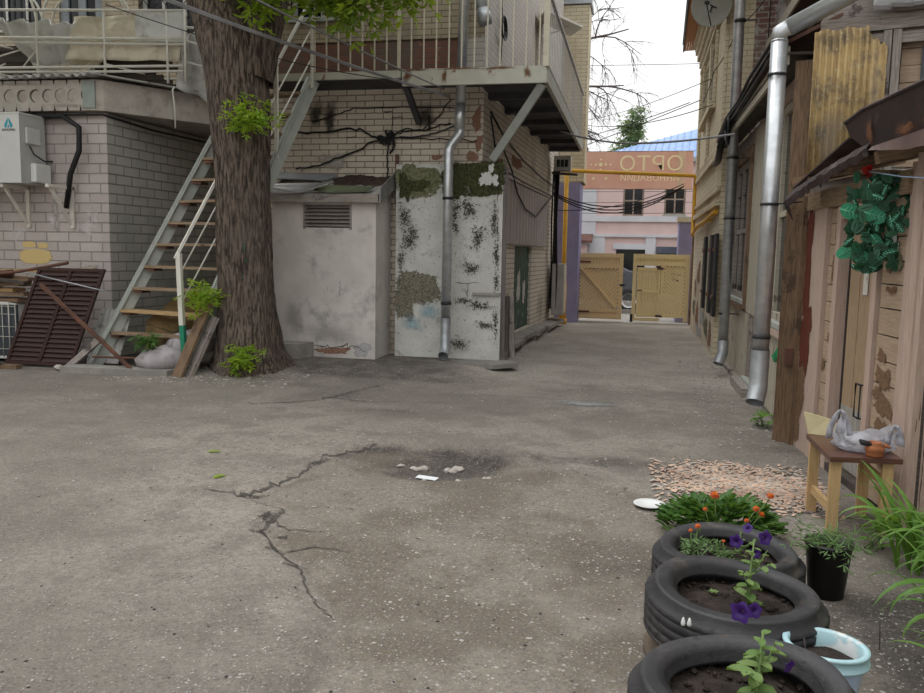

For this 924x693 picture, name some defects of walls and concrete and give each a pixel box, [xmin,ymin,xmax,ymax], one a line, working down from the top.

water stain [395,161,507,202]
spalling [313,343,372,357]
peeling [872,347,893,430]
crack [235,443,377,501]
crack [260,508,333,618]